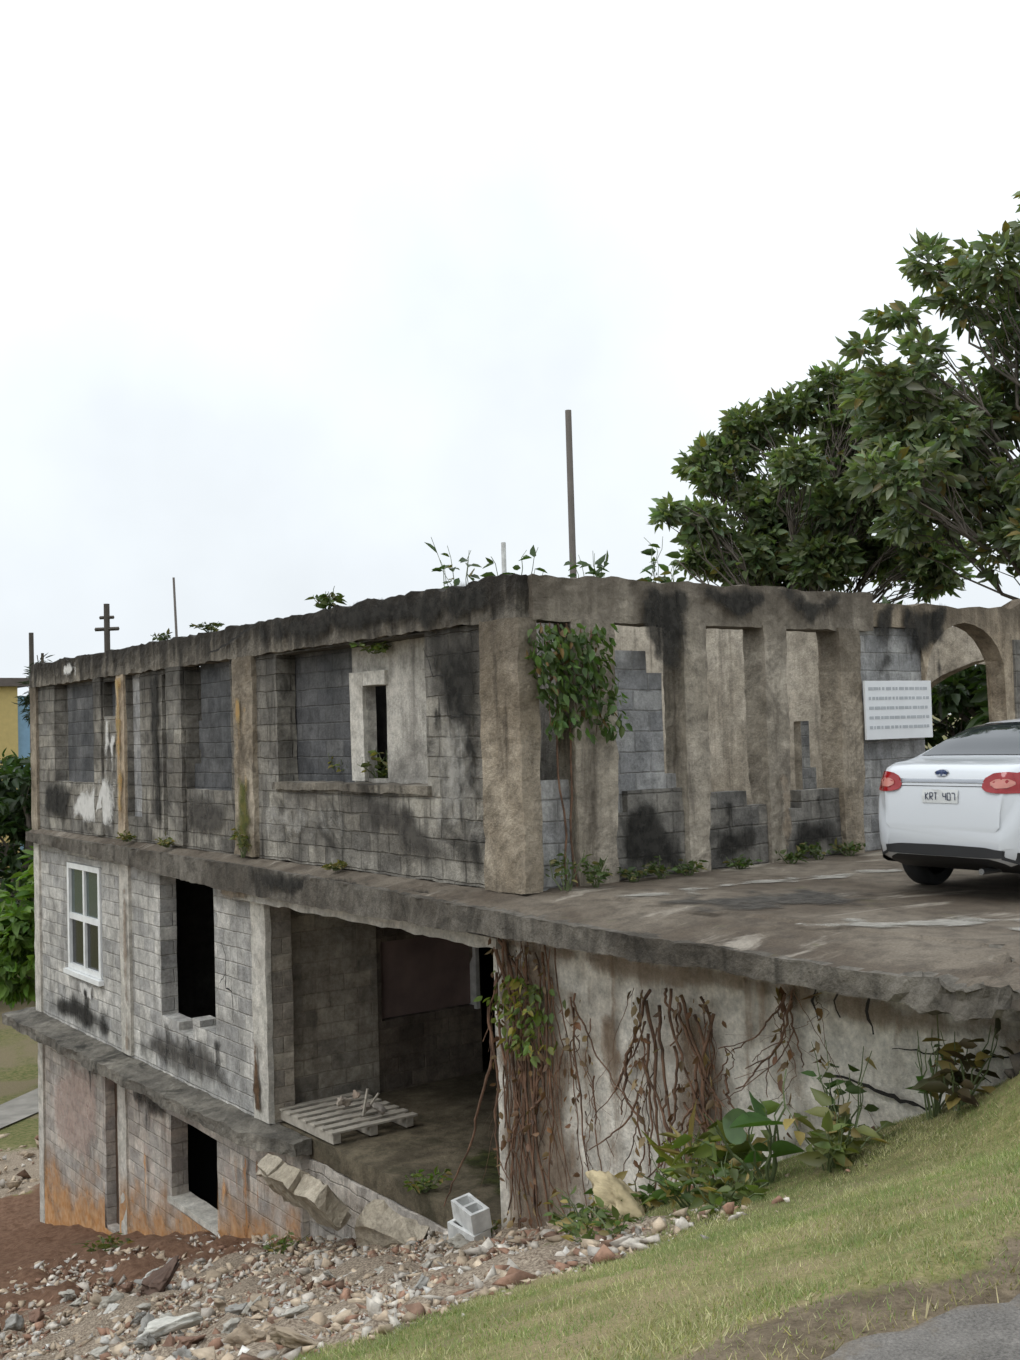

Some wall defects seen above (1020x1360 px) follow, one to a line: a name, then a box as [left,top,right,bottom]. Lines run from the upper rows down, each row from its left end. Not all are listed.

leakage [257,583,487,640]
leakage [434,644,478,796]
leakage [468,839,480,869]
spalling [1003,1036,1020,1079]